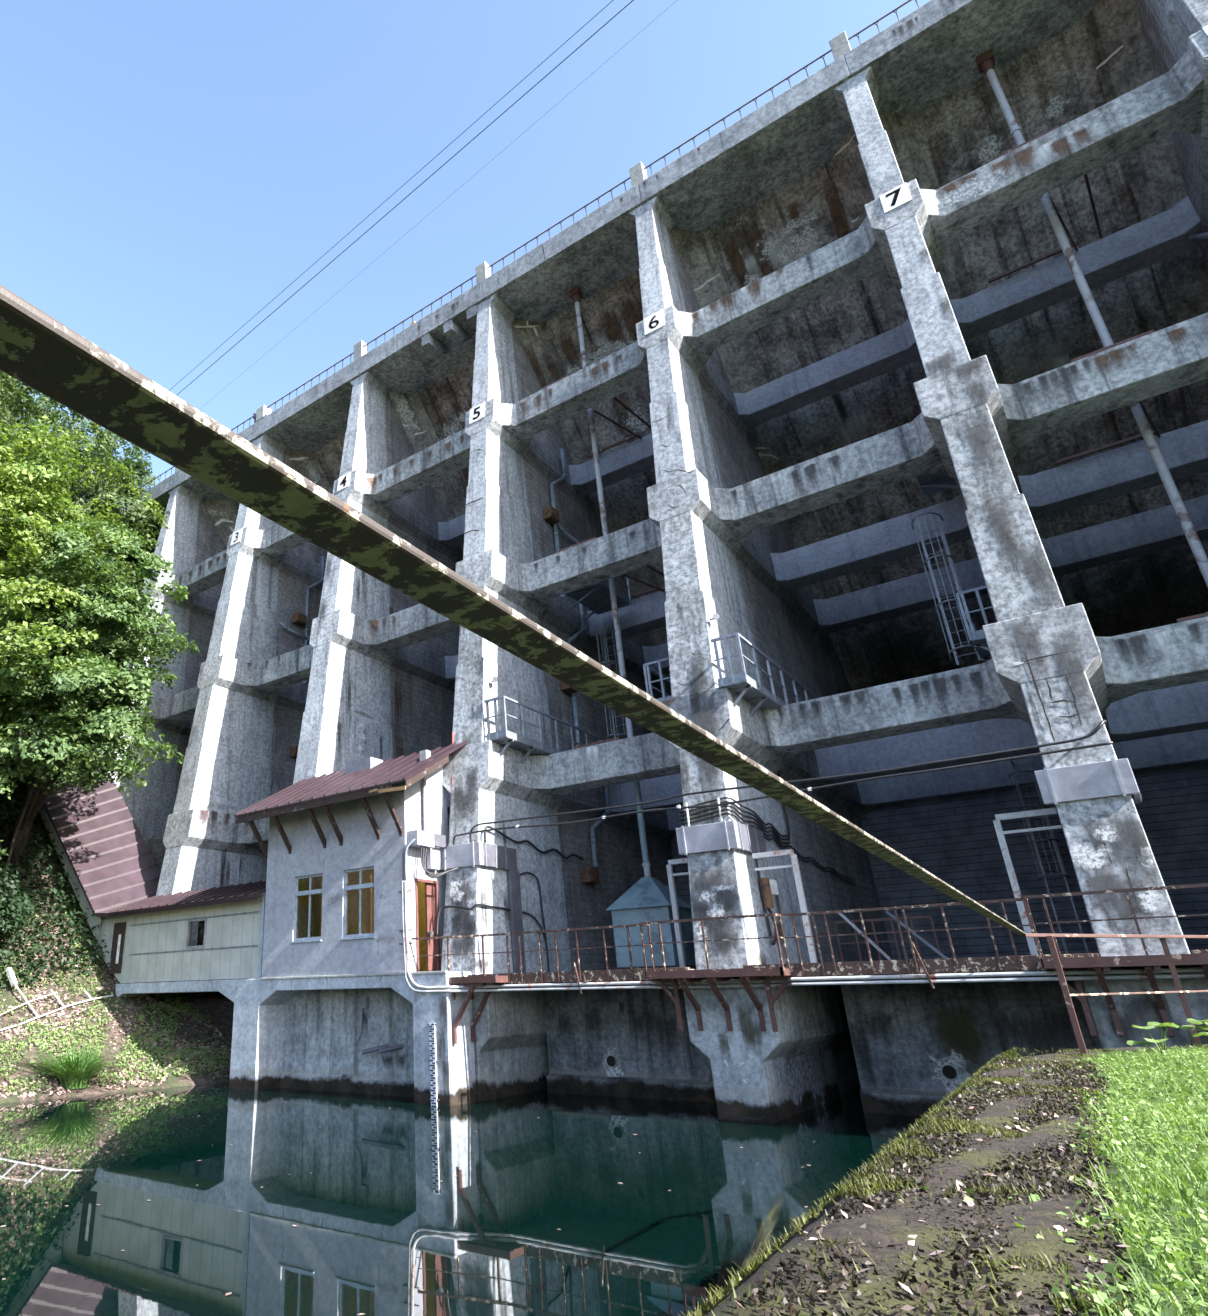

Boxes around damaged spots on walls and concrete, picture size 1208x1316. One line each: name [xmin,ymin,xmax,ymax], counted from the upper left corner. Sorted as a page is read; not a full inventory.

corrosion [1052,128,1089,154]
corrosion [991,146,1033,173]
corrosion [942,173,978,194]
damp [741,208,826,294]
corrosion [1169,327,1185,340]
corrosion [521,302,643,409]
corrosion [1095,344,1134,367]
corrosion [370,616,395,632]